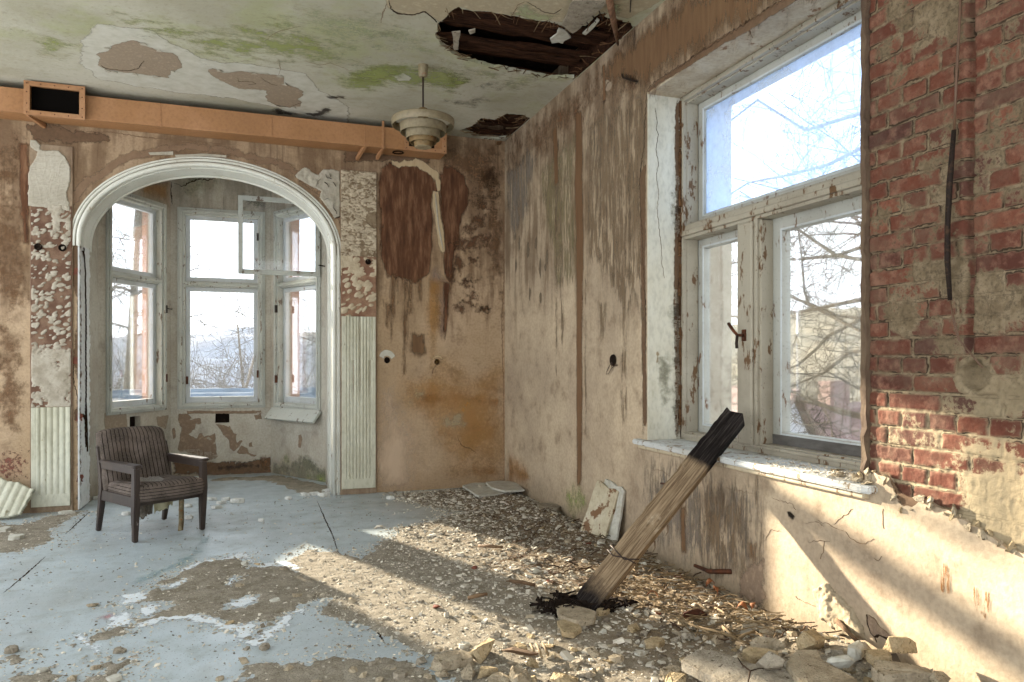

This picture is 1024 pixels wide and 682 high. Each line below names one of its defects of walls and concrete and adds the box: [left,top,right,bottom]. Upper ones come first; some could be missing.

peeling [80,24,350,123]
peeling [28,140,321,211]
flaking render [338,151,430,257]
water stain [378,0,768,507]
crack [639,0,785,357]
flaking render [857,0,1024,564]
peeling [104,413,135,429]
peeling [157,410,262,460]
water stain [657,480,765,607]
crack [695,478,884,561]